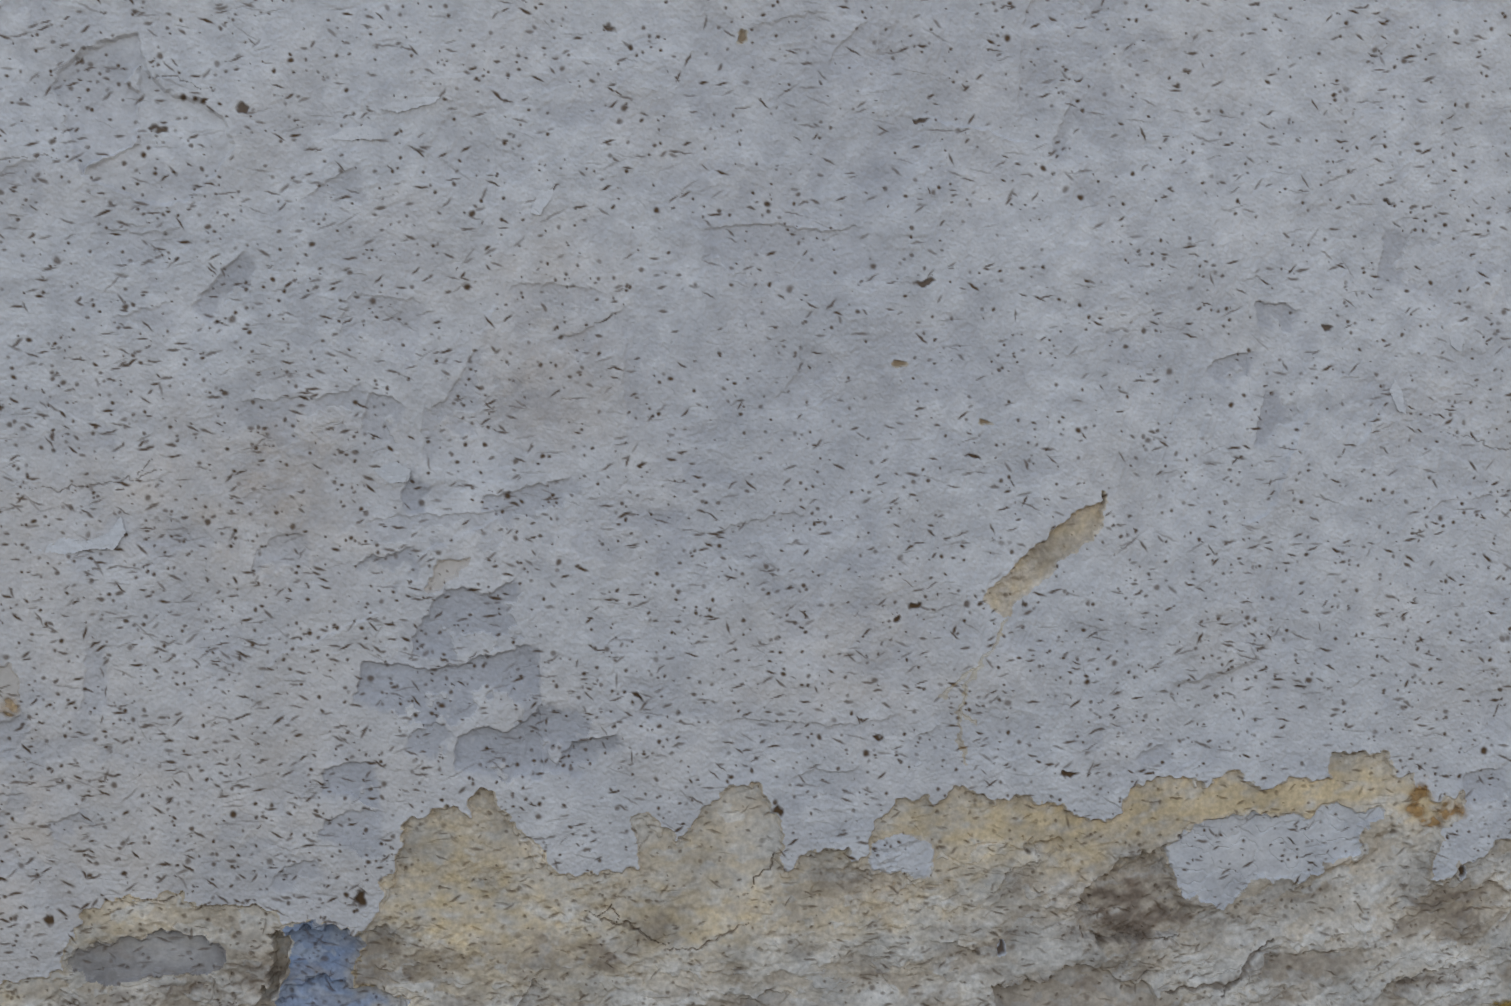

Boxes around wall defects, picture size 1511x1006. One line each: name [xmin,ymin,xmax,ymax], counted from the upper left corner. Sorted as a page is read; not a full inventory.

spalling [911,276,938,289]
spalling [891,360,908,368]
peeling [1201,298,1337,383]
peeling [351,279,638,579]
peeling [38,517,126,555]
peeling [702,509,815,551]
spalling [983,491,1109,618]
peeling [349,558,543,710]
spalling [893,603,923,624]
peeling [400,698,551,781]
peeling [550,725,625,778]
spalling [0,748,1511,1006]